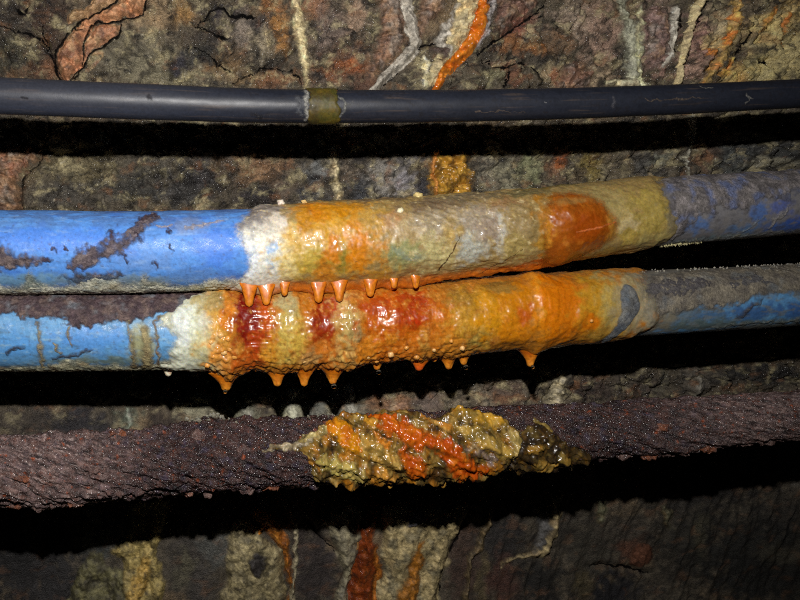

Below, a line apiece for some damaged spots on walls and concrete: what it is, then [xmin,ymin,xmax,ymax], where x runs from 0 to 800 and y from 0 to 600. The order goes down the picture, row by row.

leakage [369,0,422,90]
corrosion [427,149,474,195]
corrosion [347,497,382,600]